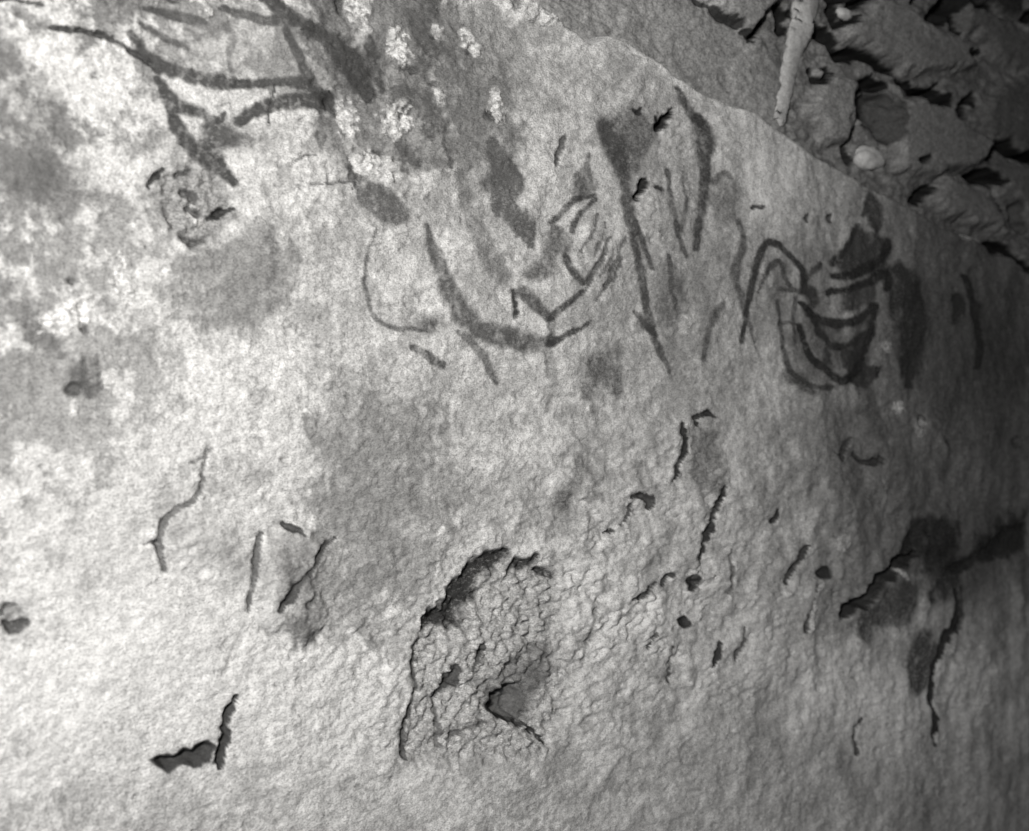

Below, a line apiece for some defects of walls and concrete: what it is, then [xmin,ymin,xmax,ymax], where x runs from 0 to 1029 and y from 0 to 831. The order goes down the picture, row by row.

leakage [887,262,925,389]
leakage [951,274,984,369]
leakage [65,355,101,398]
crack [143,448,213,572]
crack [246,521,336,613]
leakage [907,630,937,695]
crack [927,586,964,747]
spalling [150,694,238,773]